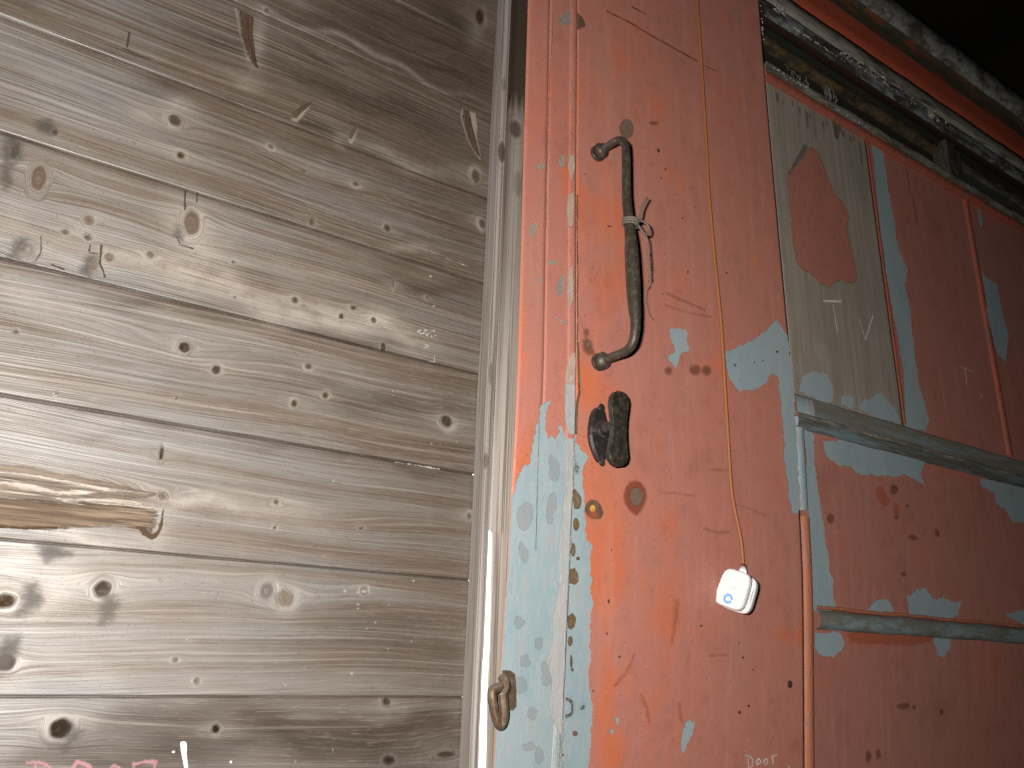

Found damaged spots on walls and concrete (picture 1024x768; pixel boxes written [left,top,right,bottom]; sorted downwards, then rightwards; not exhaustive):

peeling [548,260,576,325]
peeling [668,327,689,368]
peeling [725,144,929,612]
peeling [981,271,1009,363]
peeling [494,353,593,768]
peeling [906,587,961,618]
peeling [814,631,844,658]
peeling [933,638,951,658]